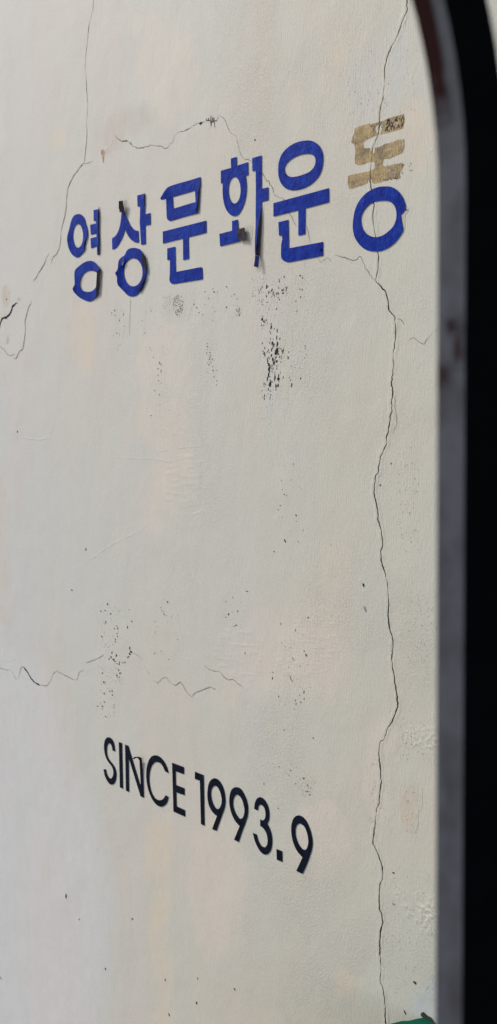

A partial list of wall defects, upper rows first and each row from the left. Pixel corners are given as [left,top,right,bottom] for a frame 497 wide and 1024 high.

crack [1,654,104,686]
crack [116,0,435,1024]